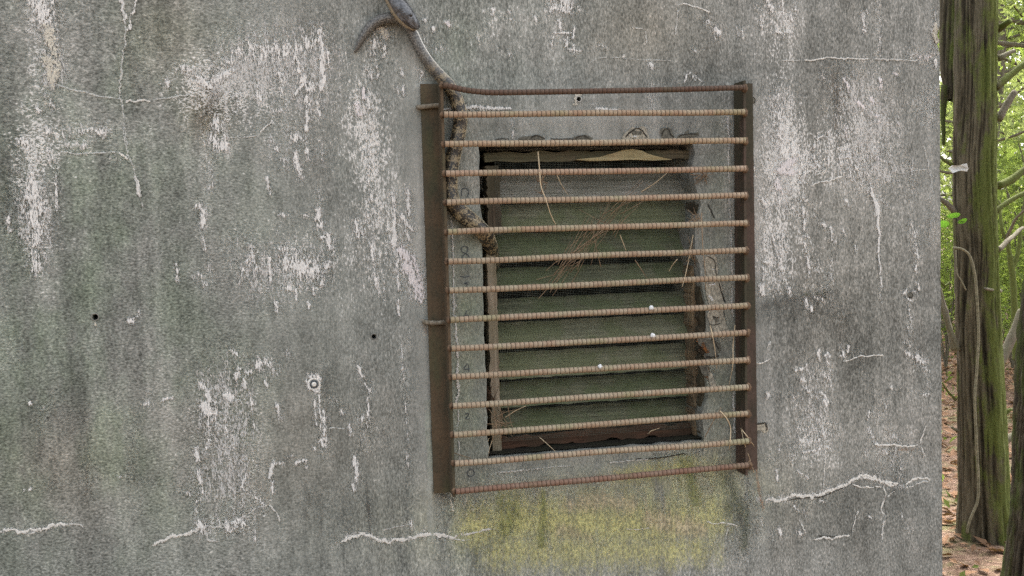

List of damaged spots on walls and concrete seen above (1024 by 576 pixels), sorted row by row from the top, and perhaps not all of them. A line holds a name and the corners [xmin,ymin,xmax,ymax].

crack [56,0,195,207]
crack [756,426,930,542]
crack [0,522,83,535]
crack [152,505,280,546]
crack [340,524,495,544]